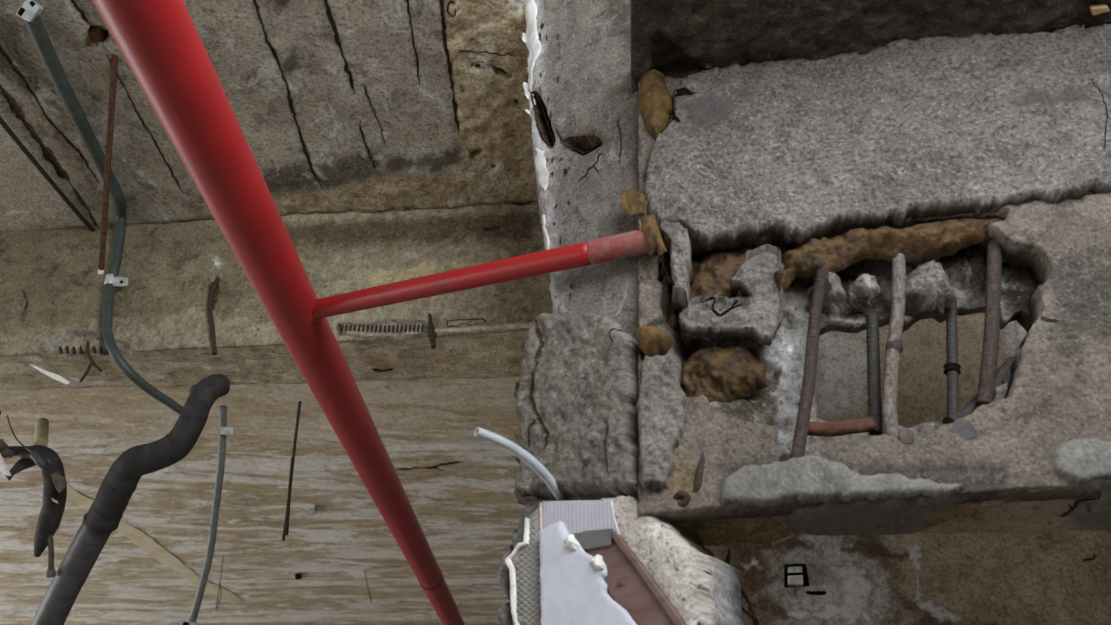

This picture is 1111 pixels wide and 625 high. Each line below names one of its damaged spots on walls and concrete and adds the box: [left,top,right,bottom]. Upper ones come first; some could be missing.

crack [0,46,101,226]
corrosion [86,27,103,46]
crack [253,0,323,191]
crack [324,0,386,168]
crack [406,0,514,134]
peeling [541,214,550,250]
crack [482,72,622,245]
peeling [518,0,602,192]
spalling [647,260,665,282]
spalling [682,238,1039,458]
leakage [744,539,811,590]
leakage [770,540,961,625]